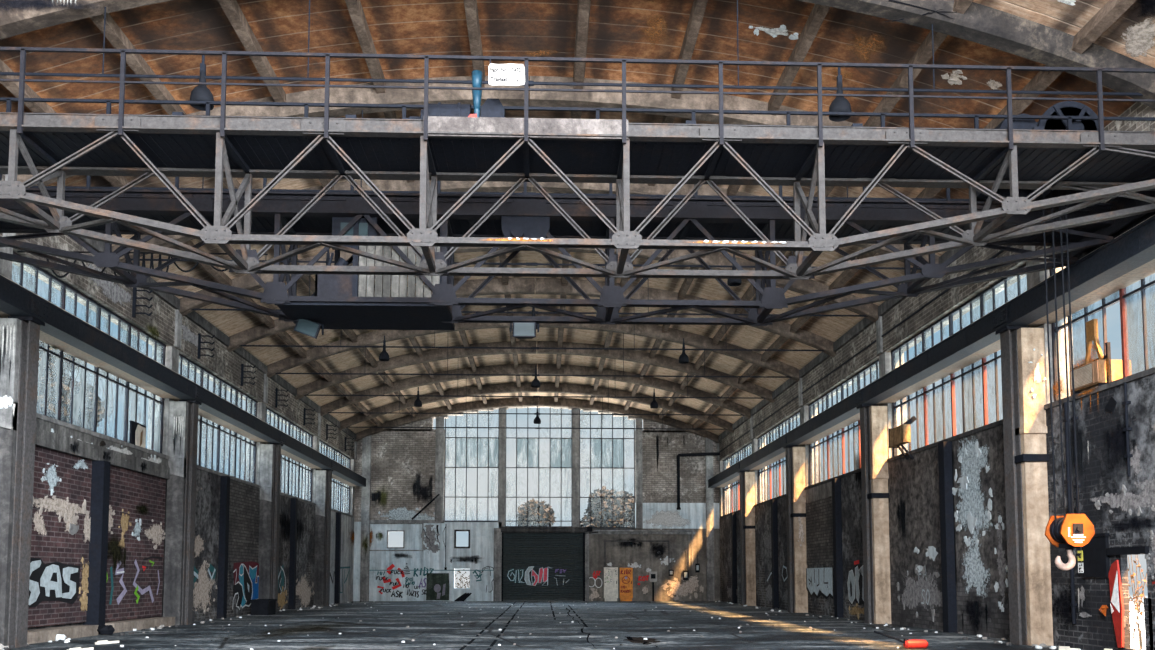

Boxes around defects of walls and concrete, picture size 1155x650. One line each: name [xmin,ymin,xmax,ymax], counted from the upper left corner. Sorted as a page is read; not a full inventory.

peeling [749,25,798,40]
peeling [1120,18,1155,57]
peeling [941,69,967,85]
spalling [0,395,15,415]
flaking render [1090,440,1155,516]
peeling [32,495,91,543]
peeling [109,505,165,550]
flaking render [952,438,1008,612]
flaking render [897,546,942,622]